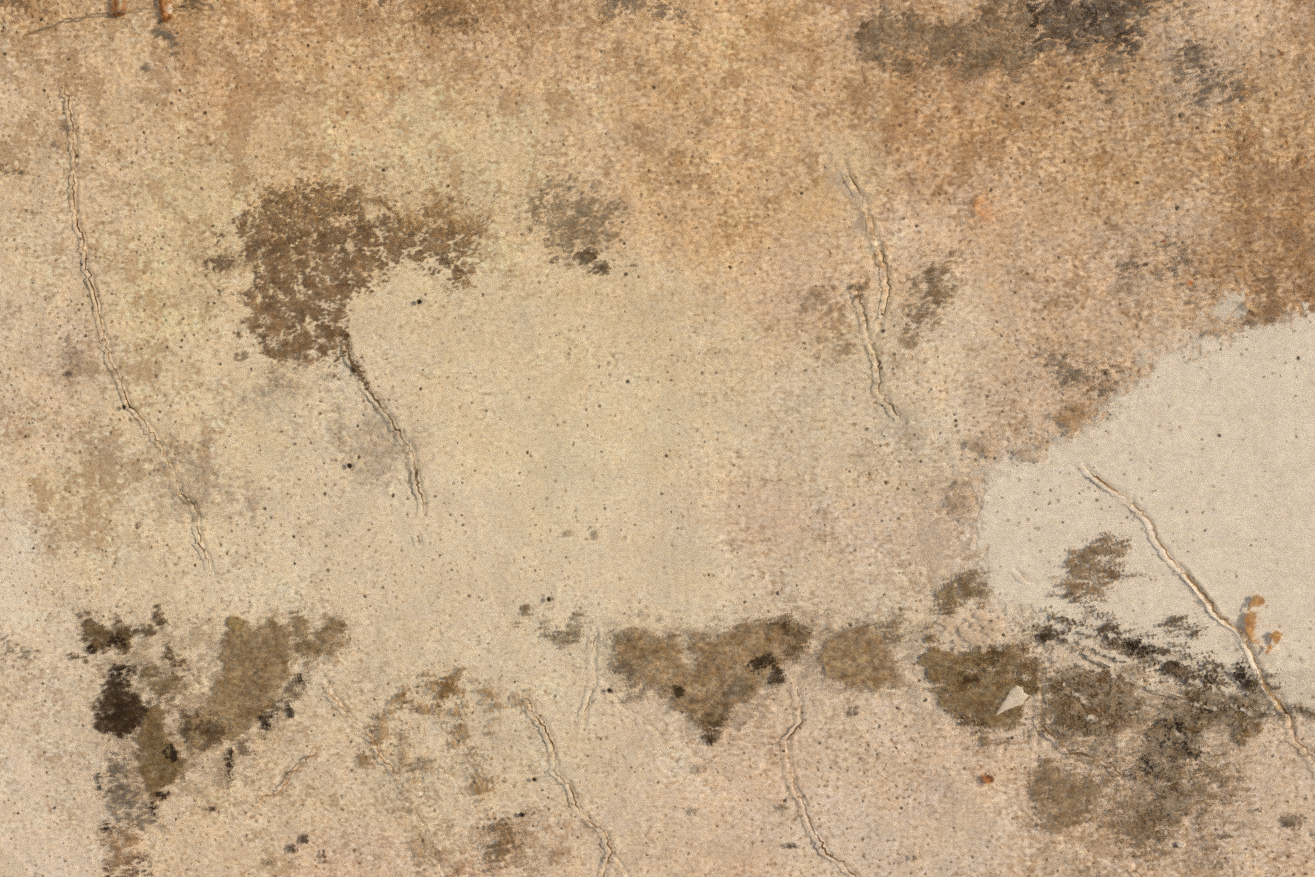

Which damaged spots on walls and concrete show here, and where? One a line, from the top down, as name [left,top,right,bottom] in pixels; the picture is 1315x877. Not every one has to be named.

corrosion [112,0,126,16]
corrosion [159,0,171,23]
damp [847,0,1264,126]
crack [64,88,210,568]
damp [205,166,494,408]
crack [346,345,424,543]
damp [67,604,351,877]
damp [517,604,584,649]
crack [786,689,857,877]
damp [599,407,1315,877]
crack [1090,472,1314,760]
corrosion [1245,595,1282,654]